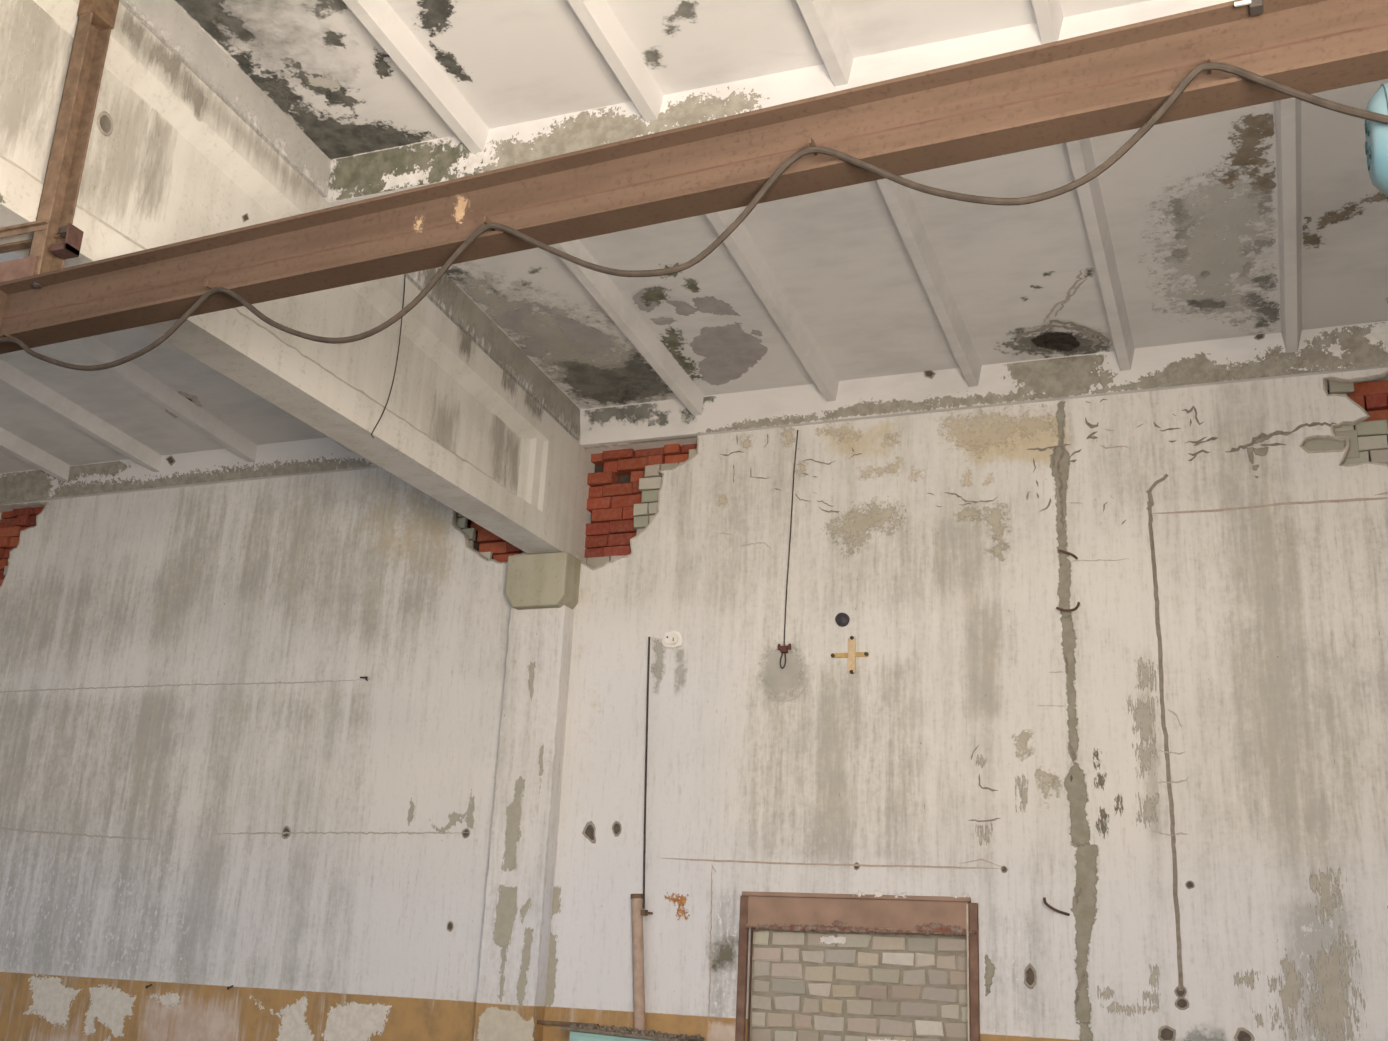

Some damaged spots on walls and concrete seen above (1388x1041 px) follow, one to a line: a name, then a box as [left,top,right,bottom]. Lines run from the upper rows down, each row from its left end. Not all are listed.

leakage [127,0,483,201]
leakage [1213,113,1276,194]
leakage [418,263,715,439]
peeling [633,286,768,386]
leakage [1187,299,1225,311]
leakage [1242,275,1279,328]
flaking render [576,320,1388,570]
peeling [0,456,372,588]
crack [928,399,1388,1041]
peeling [477,746,561,1041]
peeling [23,974,183,1041]
peeling [249,993,392,1041]